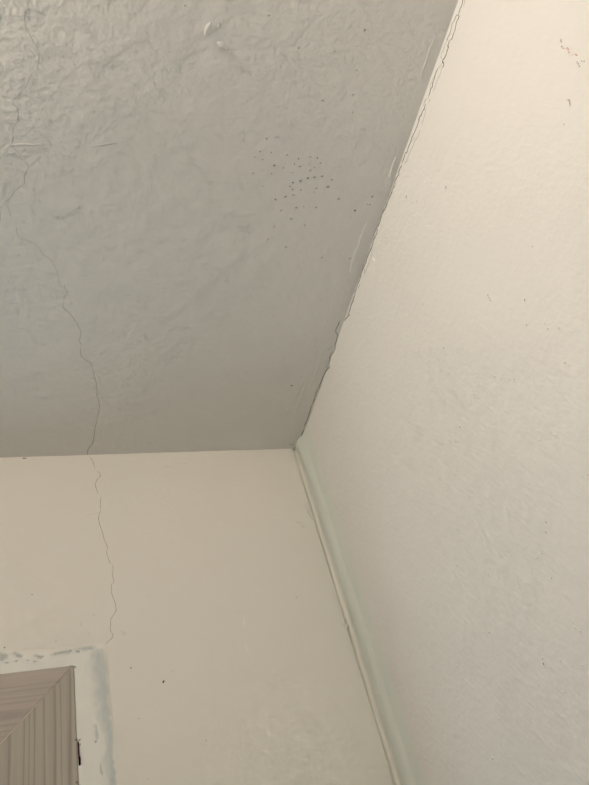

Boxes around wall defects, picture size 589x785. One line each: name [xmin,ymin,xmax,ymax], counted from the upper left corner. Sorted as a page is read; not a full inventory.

crack [290,0,465,446]